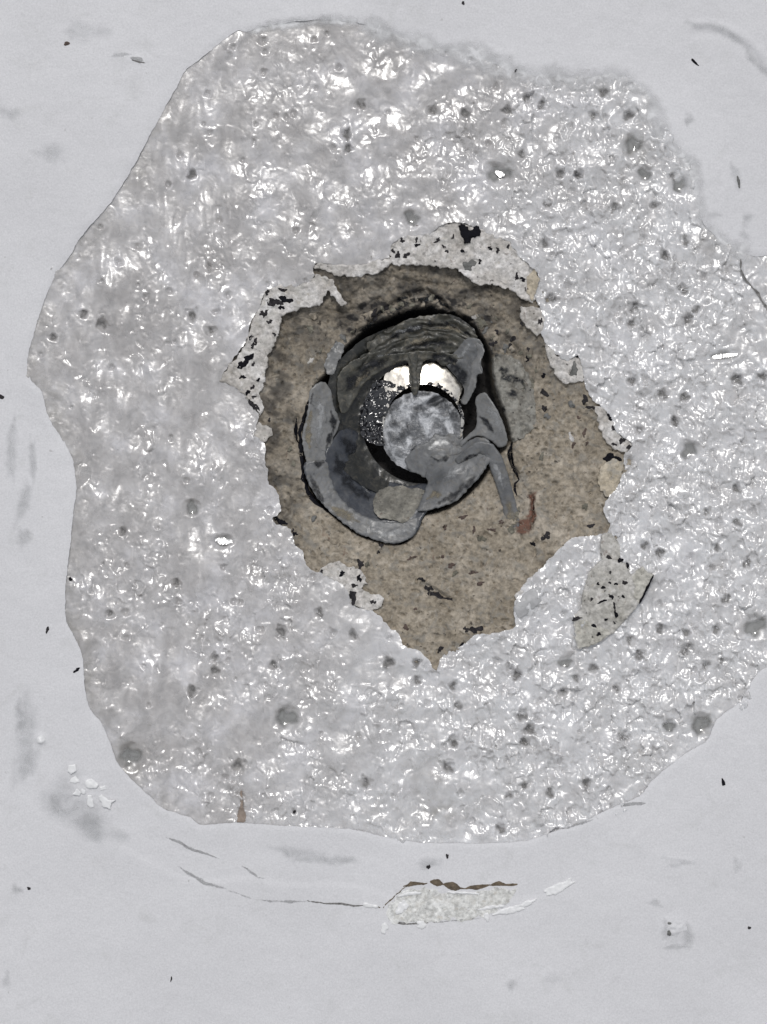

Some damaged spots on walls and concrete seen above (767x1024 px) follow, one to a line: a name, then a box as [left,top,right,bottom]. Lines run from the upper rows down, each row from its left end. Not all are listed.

peeling [26,20,767,844]
corrosion [517,493,536,534]
crack [170,838,218,887]
crack [244,867,518,908]
peeling [363,877,575,934]